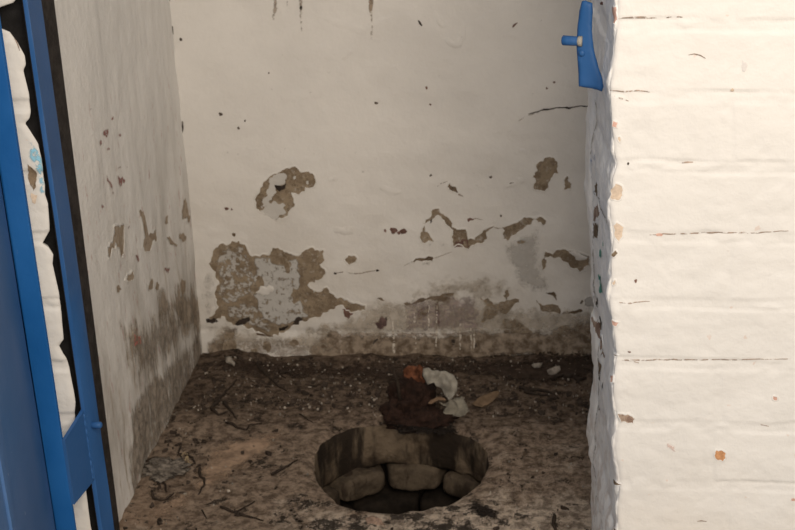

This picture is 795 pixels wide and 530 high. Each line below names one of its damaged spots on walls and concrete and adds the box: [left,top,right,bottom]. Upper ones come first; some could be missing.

crack [519,103,597,155]
peeling [253,165,317,222]
peeling [531,155,573,193]
leakage [135,285,200,383]
leakage [208,328,236,353]
peeling [206,233,367,339]
peeling [375,316,387,330]
peeling [404,293,454,326]
peeling [404,207,548,266]
peeling [540,247,591,273]
flaking render [536,292,620,386]